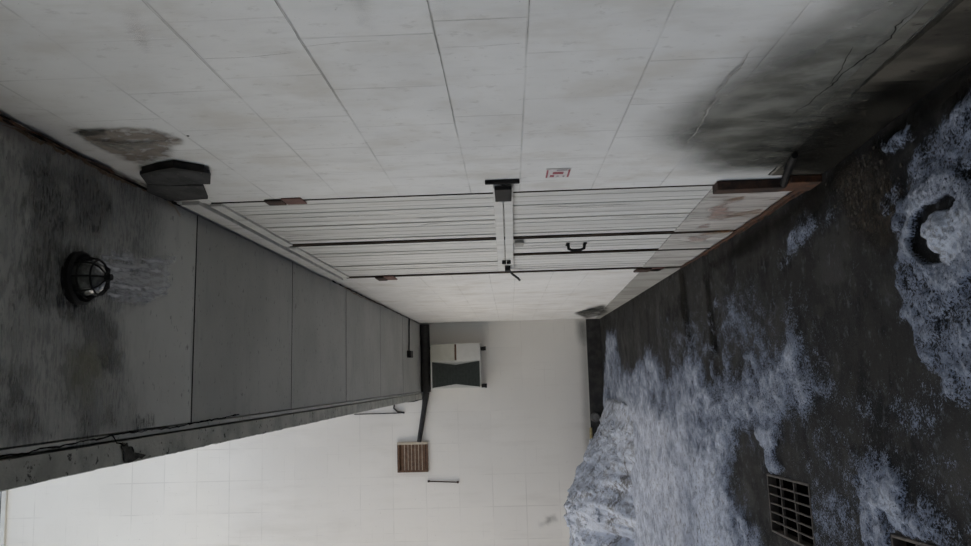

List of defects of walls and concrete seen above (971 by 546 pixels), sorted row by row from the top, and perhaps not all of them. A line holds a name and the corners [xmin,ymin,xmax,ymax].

leakage [680,0,971,267]
leakage [0,156,173,434]
crack [0,414,239,458]
spalling [109,434,146,463]